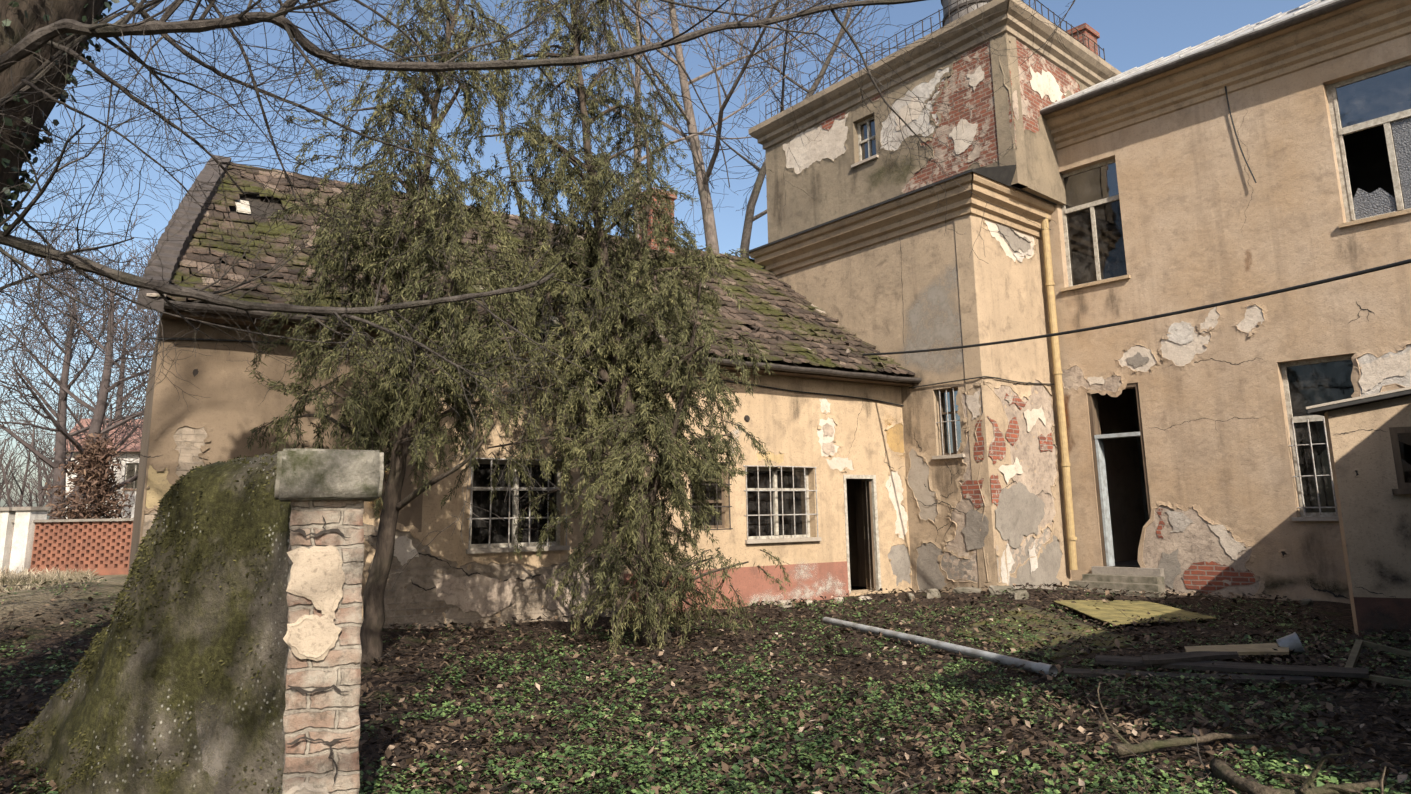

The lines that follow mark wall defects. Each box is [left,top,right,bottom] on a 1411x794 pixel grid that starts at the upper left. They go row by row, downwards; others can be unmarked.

flaking render [782,32,1082,195]
peeling [982,218,1036,265]
spalling [1351,339,1411,398]
spalling [882,300,1271,598]
flaking render [290,549,341,656]